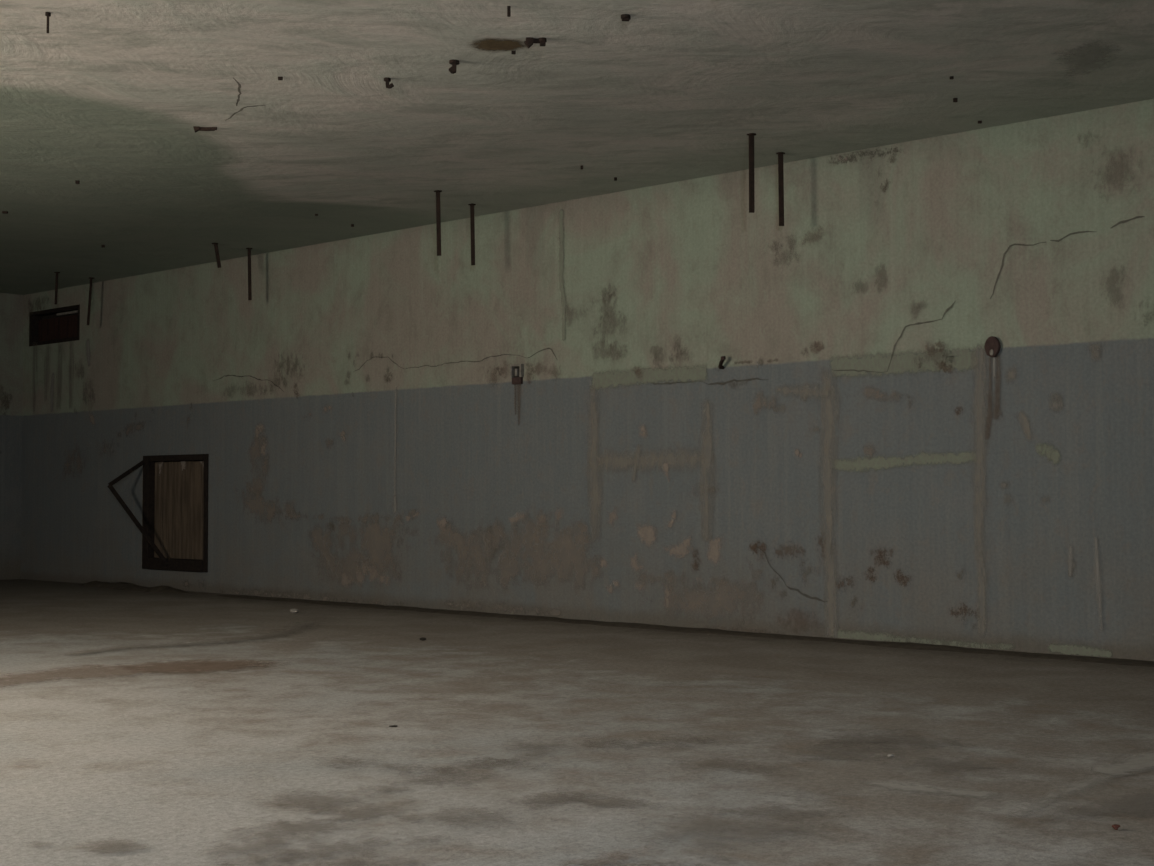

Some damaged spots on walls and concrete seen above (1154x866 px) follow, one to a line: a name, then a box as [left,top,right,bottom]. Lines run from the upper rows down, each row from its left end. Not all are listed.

crack [990,216,1145,299]
crack [353,348,557,372]
crack [832,302,955,373]
crack [759,548,827,602]